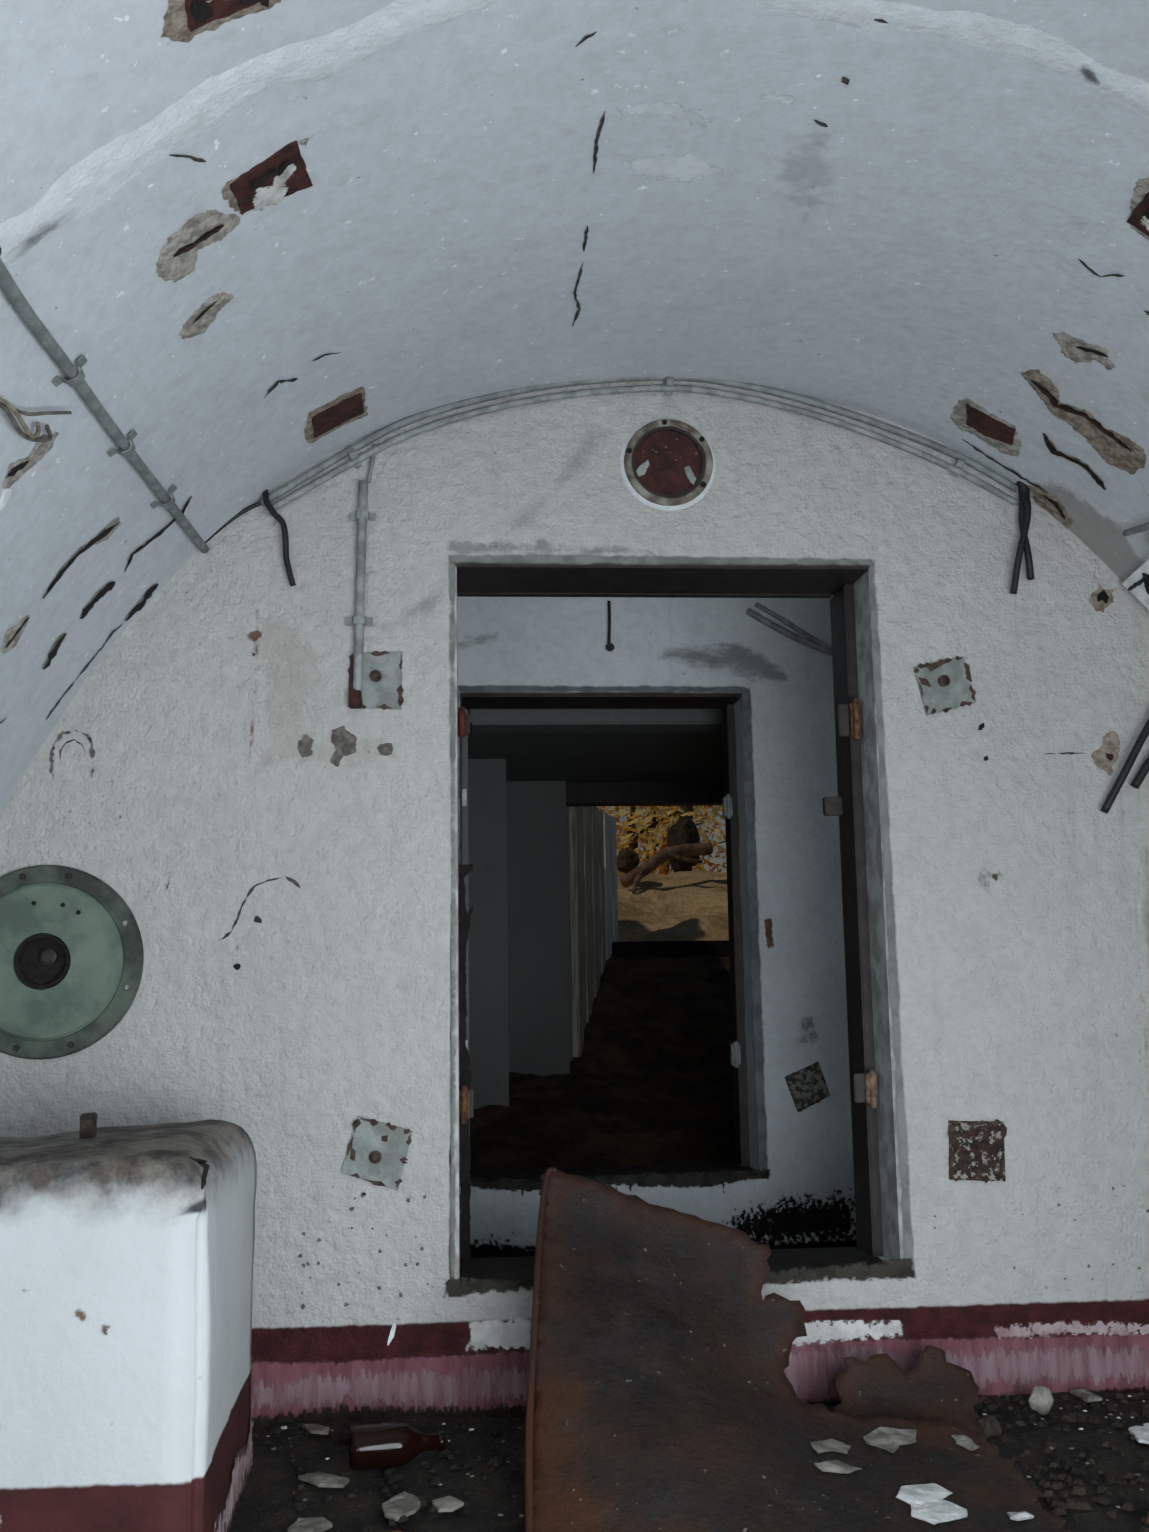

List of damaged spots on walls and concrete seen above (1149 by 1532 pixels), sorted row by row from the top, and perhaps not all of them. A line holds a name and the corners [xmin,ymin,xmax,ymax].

spalling [161,0,281,43]
crack [593,113,605,174]
spalling [156,160,289,283]
spalling [1128,177,1149,240]
crack [572,226,589,326]
spalling [1052,331,1115,371]
spalling [304,386,368,444]
spalling [1021,369,1146,490]
crack [46,623,124,720]
rust [948,1119,1007,1183]
peeling [784,1320,1149,1403]
peeling [214,1317,536,1532]